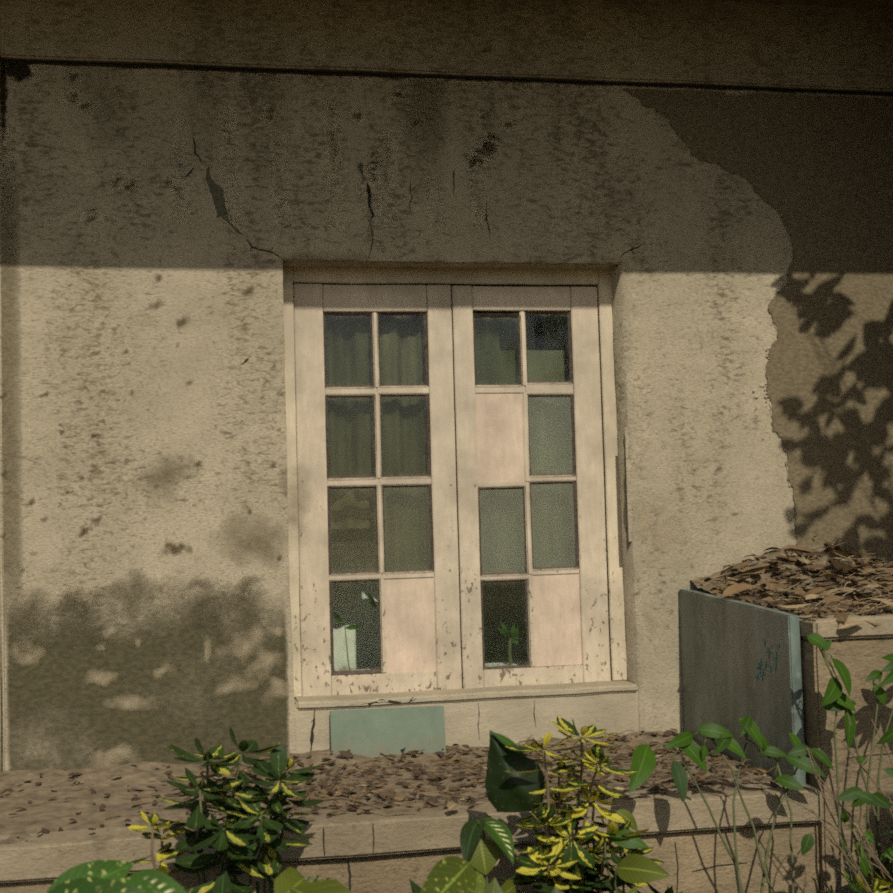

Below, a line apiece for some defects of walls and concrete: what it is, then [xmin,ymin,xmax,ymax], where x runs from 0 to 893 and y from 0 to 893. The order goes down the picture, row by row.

crack [185,137,207,178]
crack [366,183,376,255]
crack [246,239,281,258]